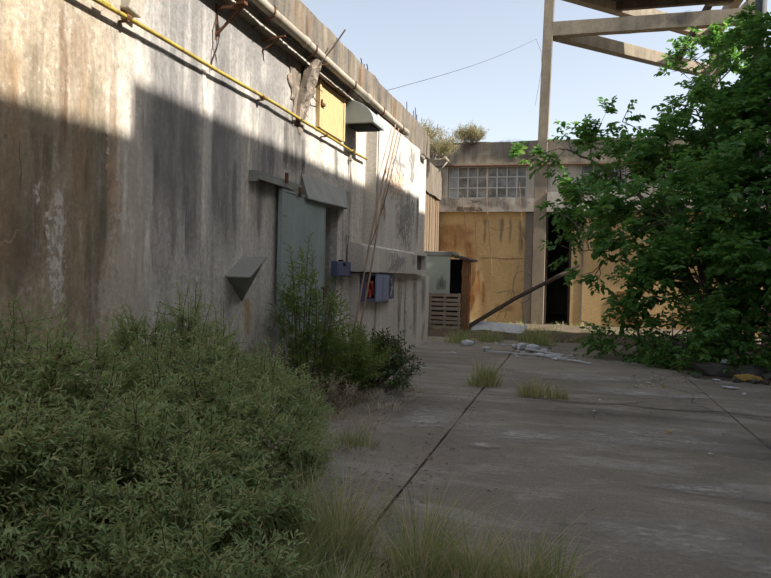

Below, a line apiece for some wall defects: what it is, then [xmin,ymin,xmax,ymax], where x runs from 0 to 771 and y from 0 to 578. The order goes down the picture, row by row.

leakage [26,122,69,323]
leakage [155,56,236,248]
leakage [245,82,274,231]
spalling [287,29,346,135]